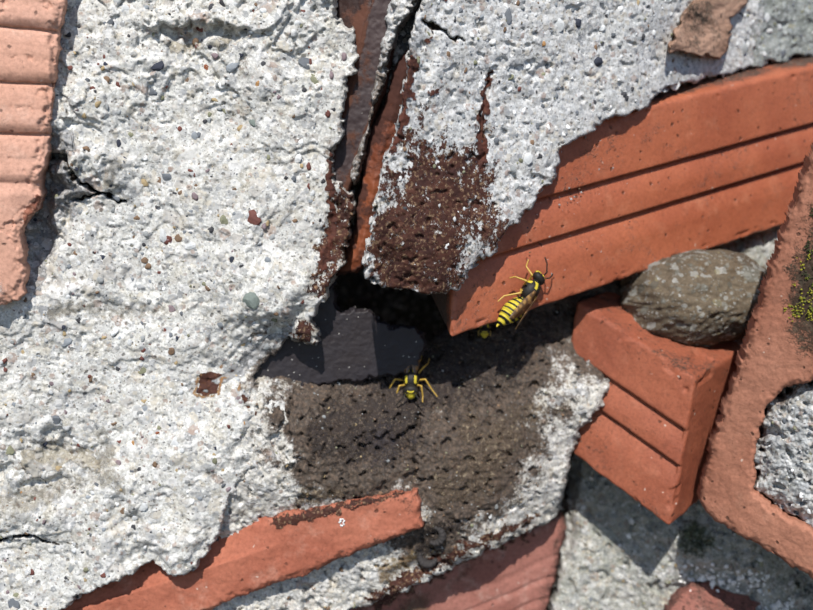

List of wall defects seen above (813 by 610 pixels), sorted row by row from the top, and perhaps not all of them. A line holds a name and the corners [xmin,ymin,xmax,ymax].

crack [382,3,464,105]
crack [65,156,127,203]
damp [284,289,598,510]
crack [0,534,60,545]
damp [378,551,417,583]